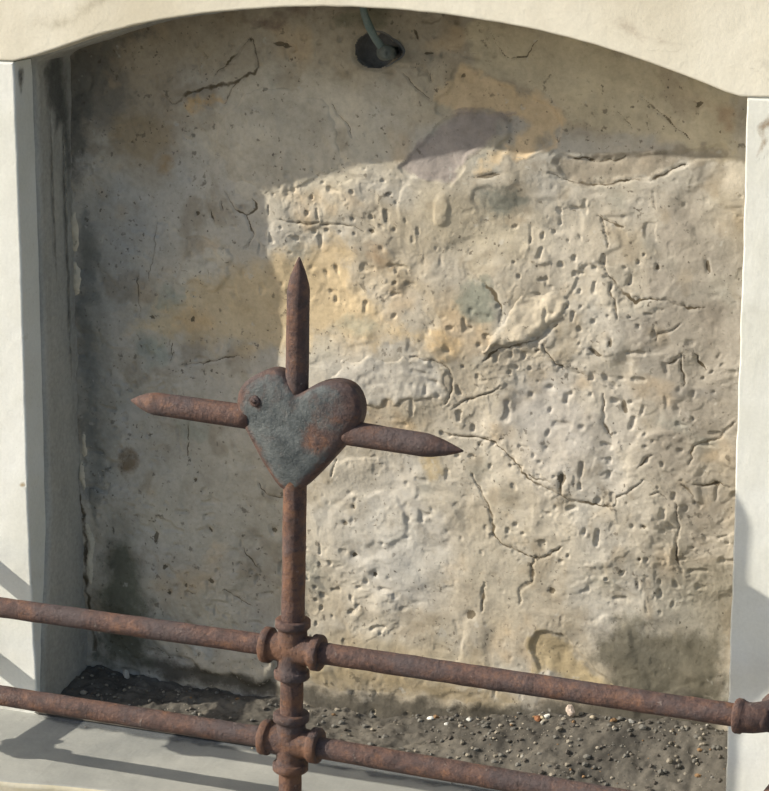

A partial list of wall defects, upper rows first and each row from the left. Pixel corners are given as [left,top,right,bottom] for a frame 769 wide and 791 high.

crack [163,37,260,105]
corrosion [701,97,745,135]
corrosion [752,109,769,163]
leakage [47,19,234,529]
crack [598,215,704,340]
crack [485,324,580,374]
crack [669,350,706,387]
crack [453,434,729,569]
crack [472,474,561,604]
leakage [134,652,280,698]
leakage [303,665,728,732]
leakage [575,607,730,702]